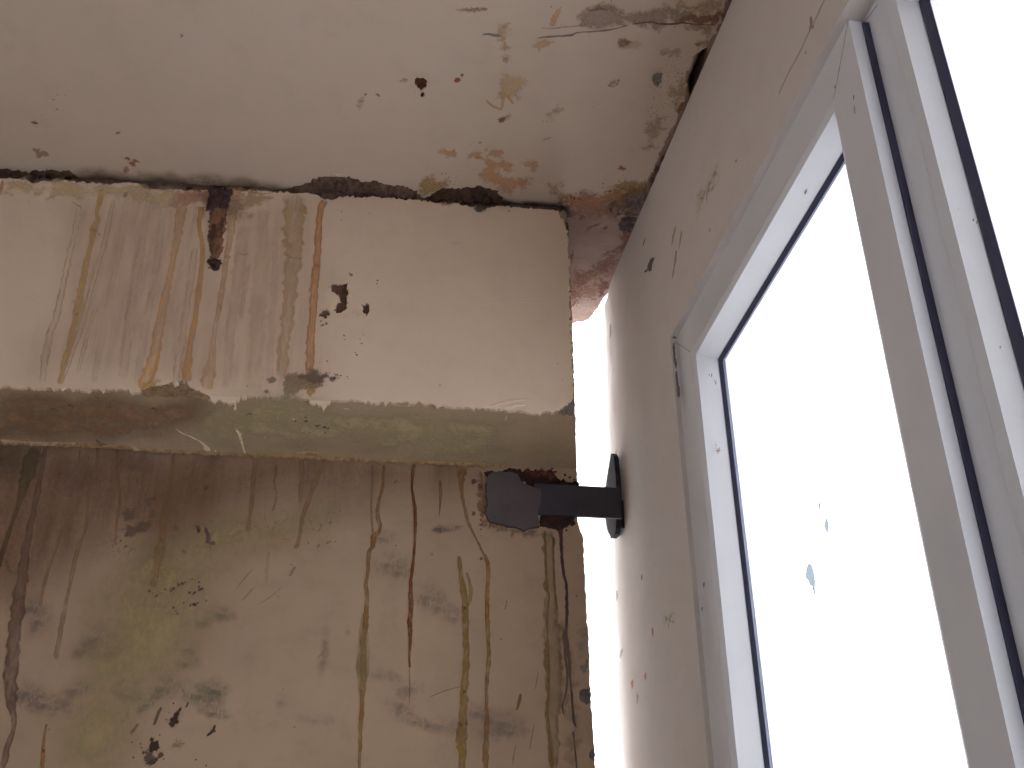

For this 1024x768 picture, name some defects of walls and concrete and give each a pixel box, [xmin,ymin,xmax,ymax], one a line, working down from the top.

peeling [411,78,429,96]
rust [54,188,104,383]
rust [139,187,270,389]
rust [276,199,326,373]
mould [264,368,348,399]
spalling [319,273,353,326]
spalling [288,173,503,205]
damp [0,445,284,768]
rust [358,466,397,768]
rust [407,465,417,668]
rust [456,470,491,768]